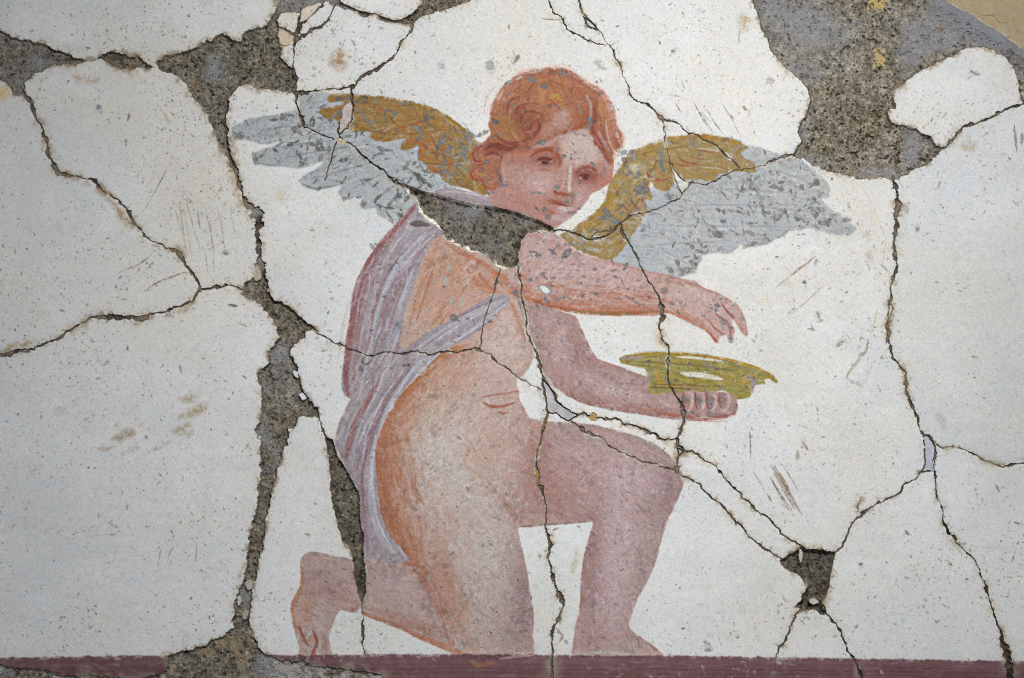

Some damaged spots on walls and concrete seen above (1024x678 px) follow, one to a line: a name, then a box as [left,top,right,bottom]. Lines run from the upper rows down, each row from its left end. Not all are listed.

crack [0,100,266,358]
spalling [0,278,385,678]
crack [276,4,414,188]
spalling [0,0,1024,343]
crack [316,0,804,678]
peeling [646,360,726,418]
spalling [780,546,836,615]
crack [775,605,863,678]
crack [834,176,1024,678]
crack [943,103,1024,150]